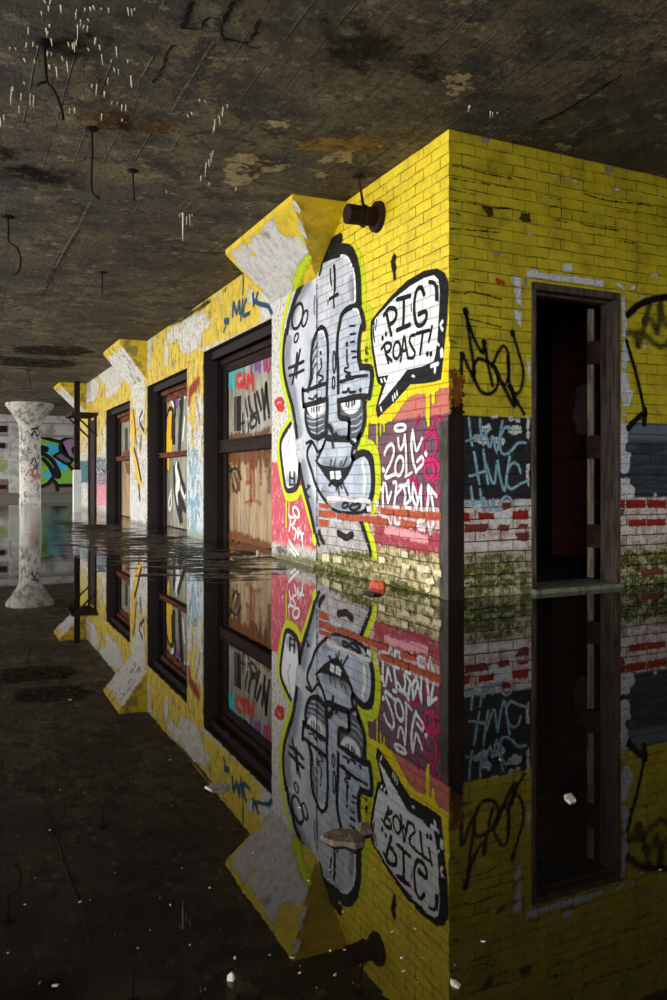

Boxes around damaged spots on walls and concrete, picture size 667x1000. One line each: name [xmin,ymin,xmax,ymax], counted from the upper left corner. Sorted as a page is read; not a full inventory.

crack [152,1,261,83]
leakage [322,20,393,71]
peeling [267,119,291,128]
peeling [221,153,291,187]
peeling [292,135,384,179]
peeling [230,201,309,304]
peeling [164,310,270,366]
peeling [511,262,666,527]
peeling [473,414,530,445]